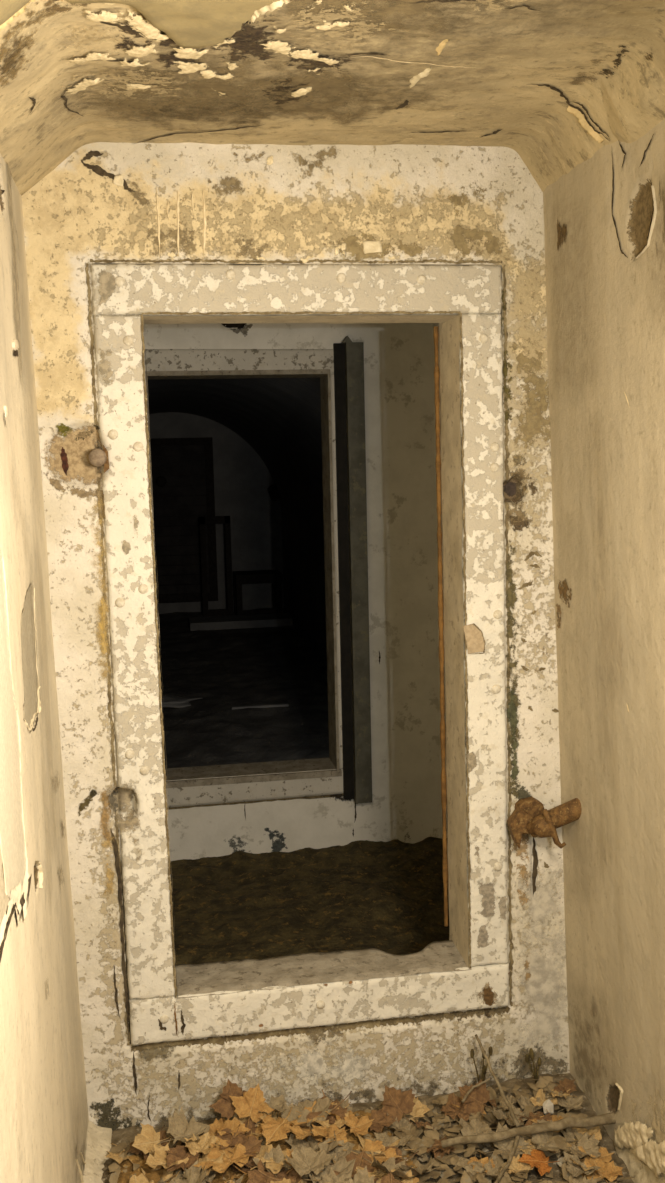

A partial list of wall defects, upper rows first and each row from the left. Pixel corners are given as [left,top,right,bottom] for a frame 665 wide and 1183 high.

water stain [0,1,91,86]
flaking render [50,0,394,99]
water stain [99,15,431,130]
crack [81,151,135,192]
water stain [128,177,242,260]
crack [528,84,654,258]
flaking render [626,179,657,260]
peeling [463,623,485,654]
water stain [504,514,546,799]
flaking render [0,543,44,965]
crack [111,829,151,1121]
crack [158,1006,186,1034]